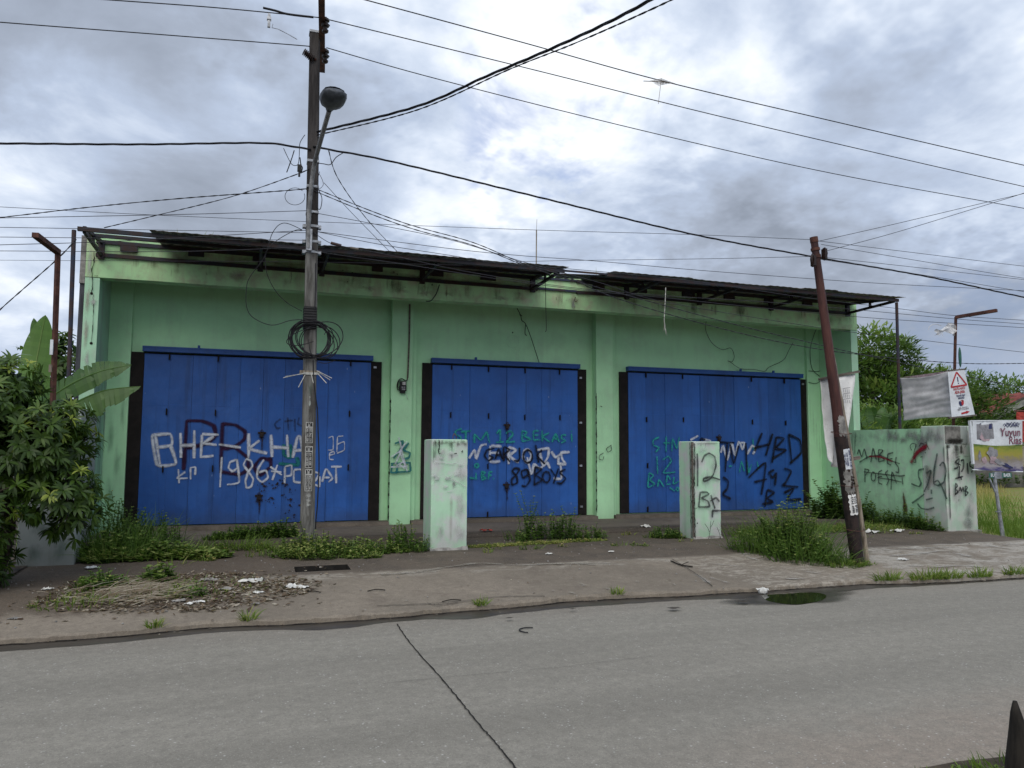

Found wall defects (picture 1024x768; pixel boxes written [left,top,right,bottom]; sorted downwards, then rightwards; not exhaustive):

water stain [888,431,963,519]